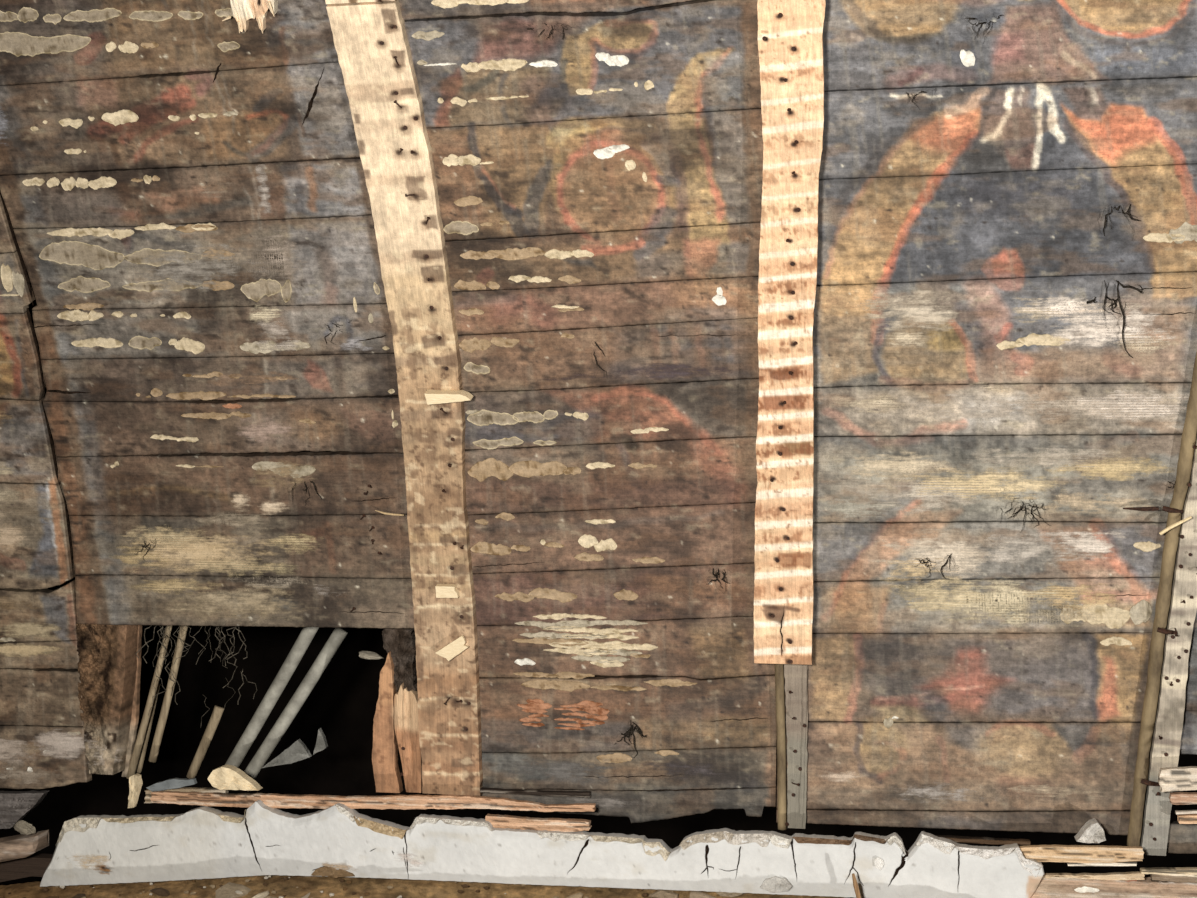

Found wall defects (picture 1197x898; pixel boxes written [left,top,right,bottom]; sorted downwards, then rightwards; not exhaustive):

peeling [431,0,529,9]
peeling [0,7,233,57]
peeling [417,59,558,72]
peeling [30,110,139,132]
peeling [22,175,160,191]
peeling [39,223,292,322]
peeling [465,409,657,482]
peeling [495,587,697,730]
crack [567,839,589,874]
crack [701,845,741,879]
spalling [536,831,1043,877]
crack [844,842,908,886]